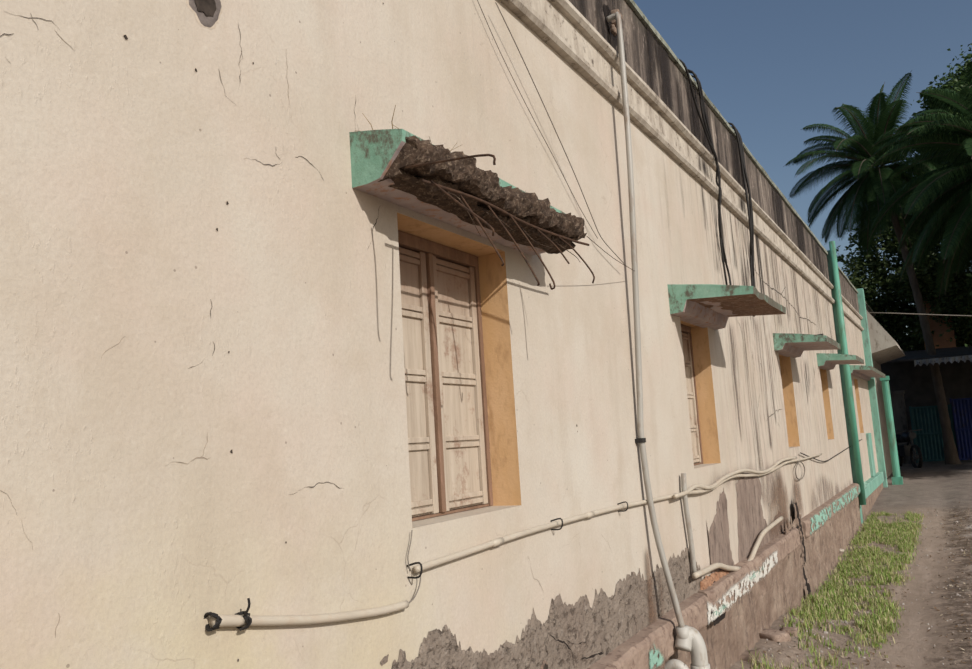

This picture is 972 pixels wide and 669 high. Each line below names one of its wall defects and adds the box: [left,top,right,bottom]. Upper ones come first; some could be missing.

flaking render [186,0,223,29]
spalling [378,135,595,290]
flaking render [380,477,786,669]
crack [785,496,813,599]